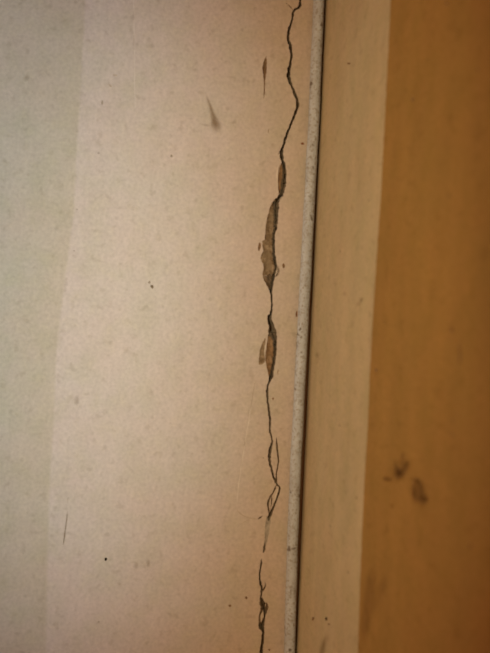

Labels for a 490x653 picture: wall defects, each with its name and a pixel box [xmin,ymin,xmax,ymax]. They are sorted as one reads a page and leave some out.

spalling [258,163,285,290]
spalling [259,333,274,375]
crack [237,0,301,653]